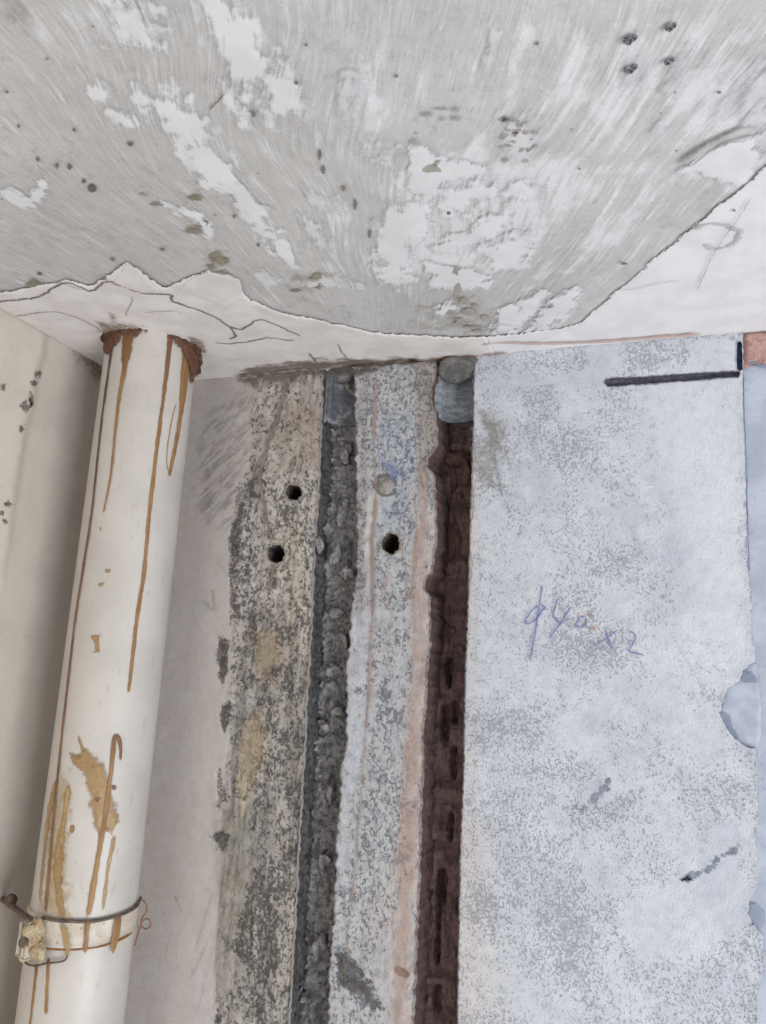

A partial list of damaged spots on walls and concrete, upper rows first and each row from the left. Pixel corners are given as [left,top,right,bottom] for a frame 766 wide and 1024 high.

peeling [93,0,172,54]
peeling [198,0,308,132]
peeling [0,56,766,380]
crack [0,277,349,364]